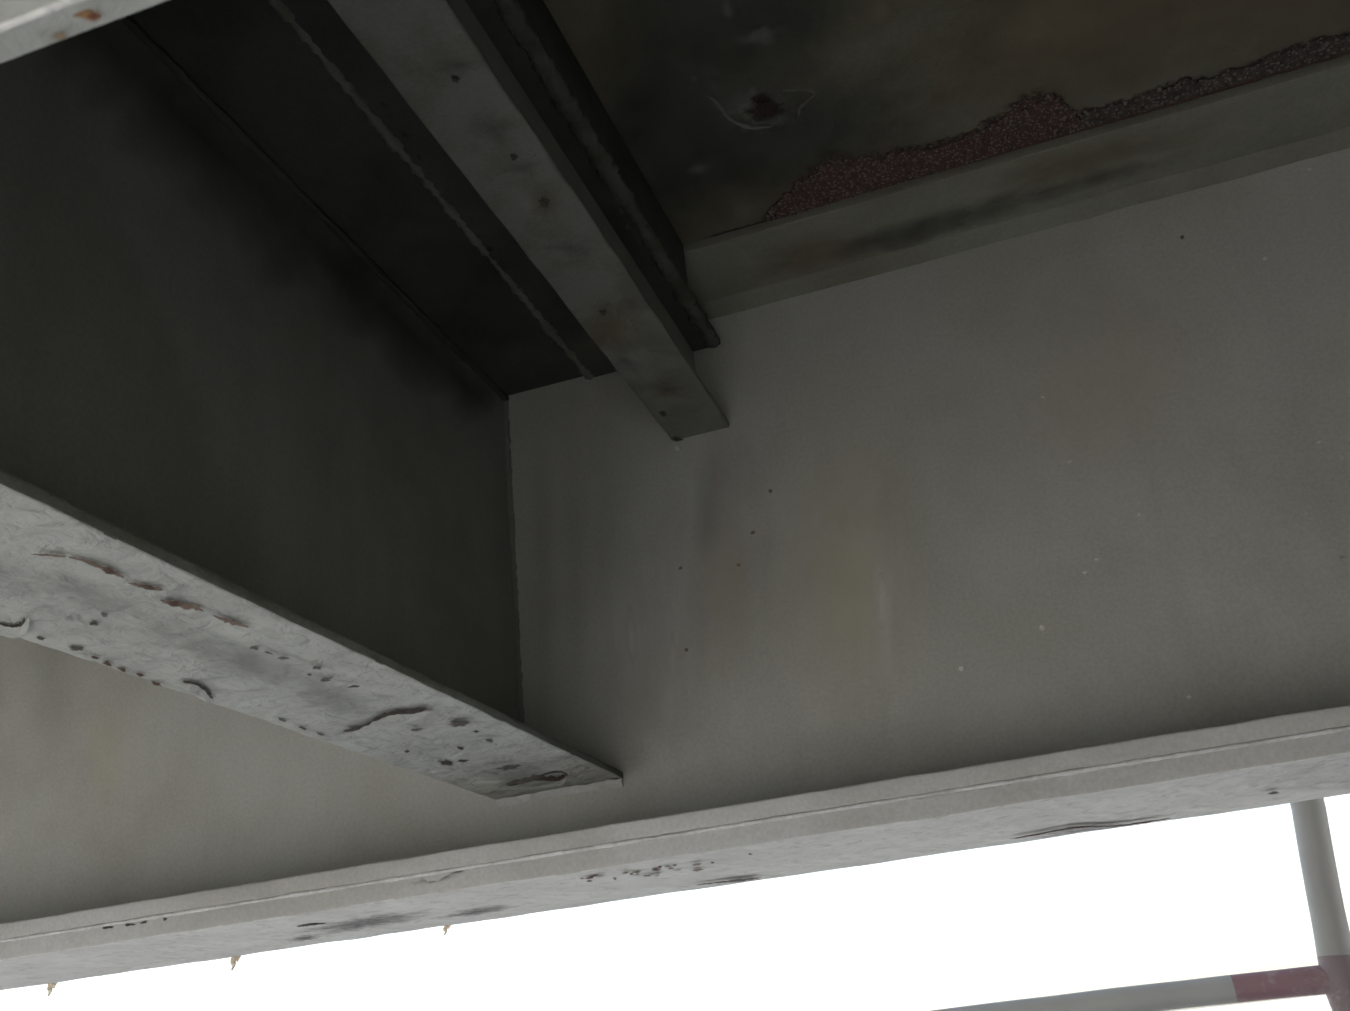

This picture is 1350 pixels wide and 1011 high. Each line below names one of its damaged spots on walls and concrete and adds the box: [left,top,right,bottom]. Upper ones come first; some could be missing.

corrosion [73,10,100,21]
peeling [0,618,45,640]
spalling [69,646,161,686]
peeling [181,680,213,703]
peeling [340,708,432,738]
peeling [449,720,494,742]